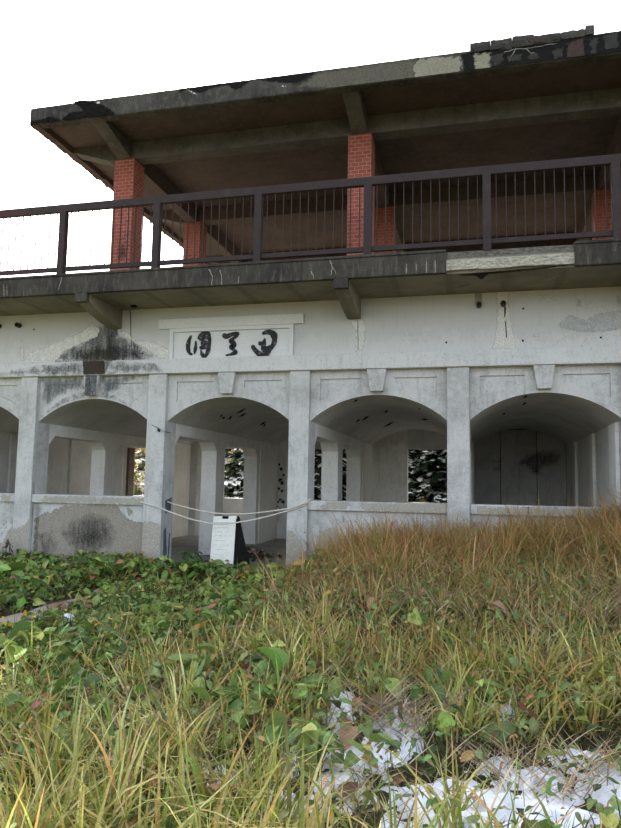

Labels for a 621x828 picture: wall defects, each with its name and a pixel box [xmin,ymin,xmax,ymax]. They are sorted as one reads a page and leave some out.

peeling [179,30,621,95]
peeling [559,296,621,332]
leakage [11,323,169,401]